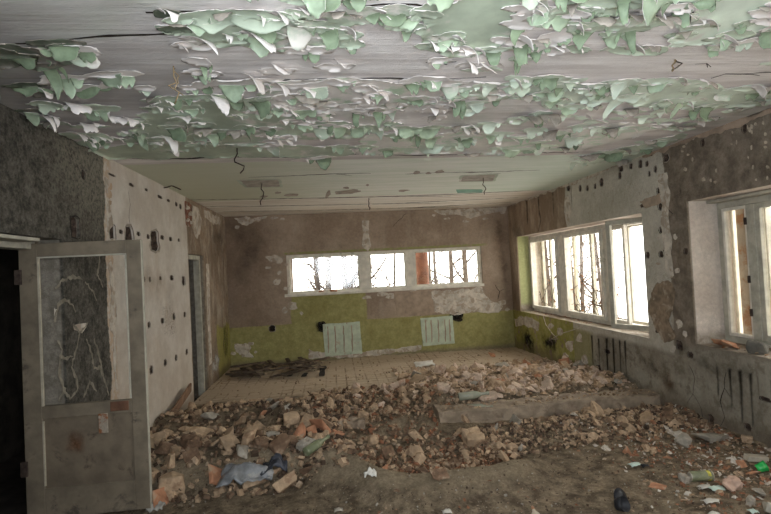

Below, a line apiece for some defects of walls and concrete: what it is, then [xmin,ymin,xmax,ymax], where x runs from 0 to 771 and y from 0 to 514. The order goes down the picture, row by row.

peeling [108,261,118,390]
peeling [150,286,622,508]
spalling [570,392,662,451]